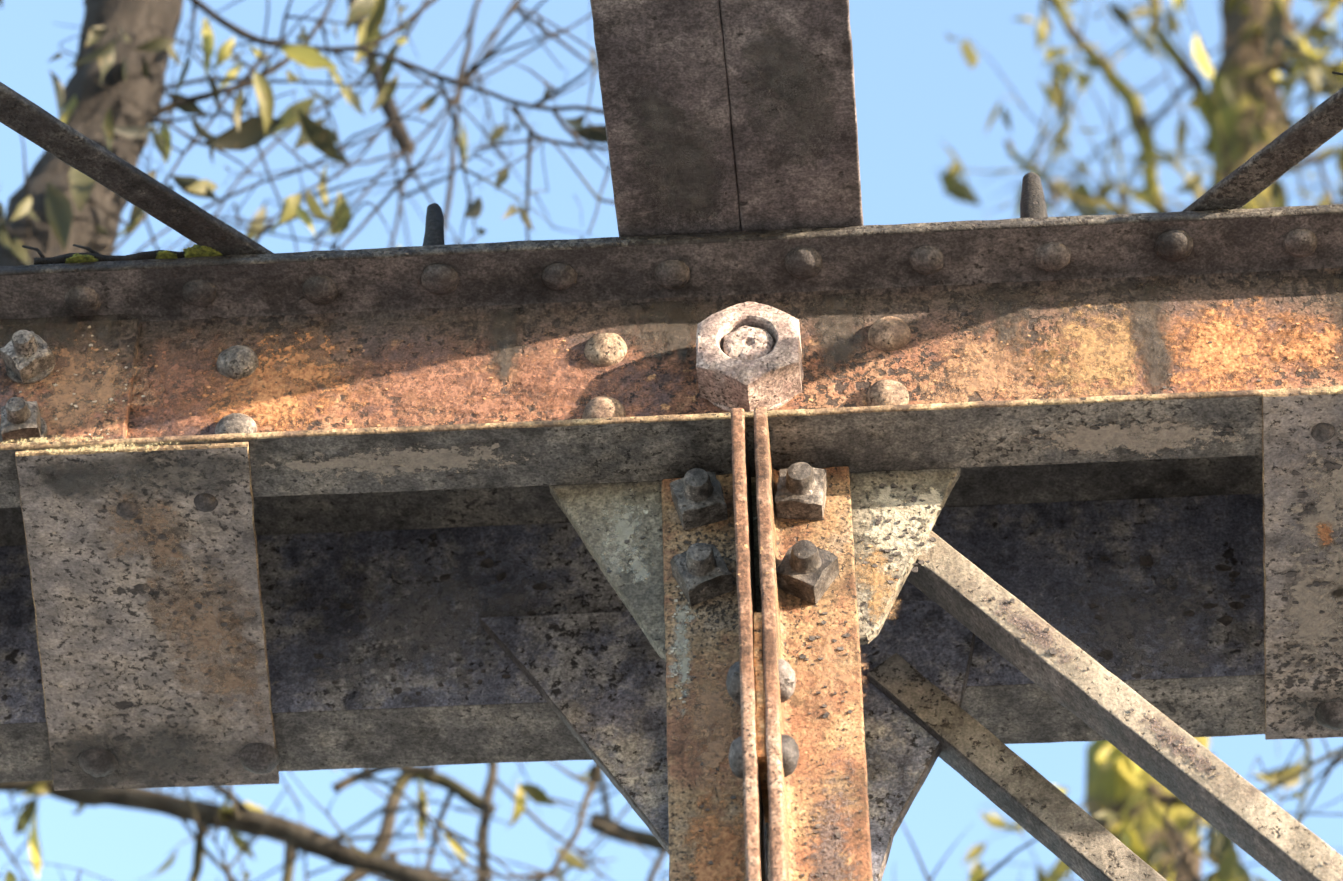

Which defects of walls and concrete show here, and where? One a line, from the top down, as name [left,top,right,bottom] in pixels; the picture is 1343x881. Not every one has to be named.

corrosion [19,325,615,442]
corrosion [916,304,1139,403]
corrosion [1158,302,1343,392]
corrosion [856,545,899,622]
corrosion [679,642,745,881]
corrosion [796,612,864,881]